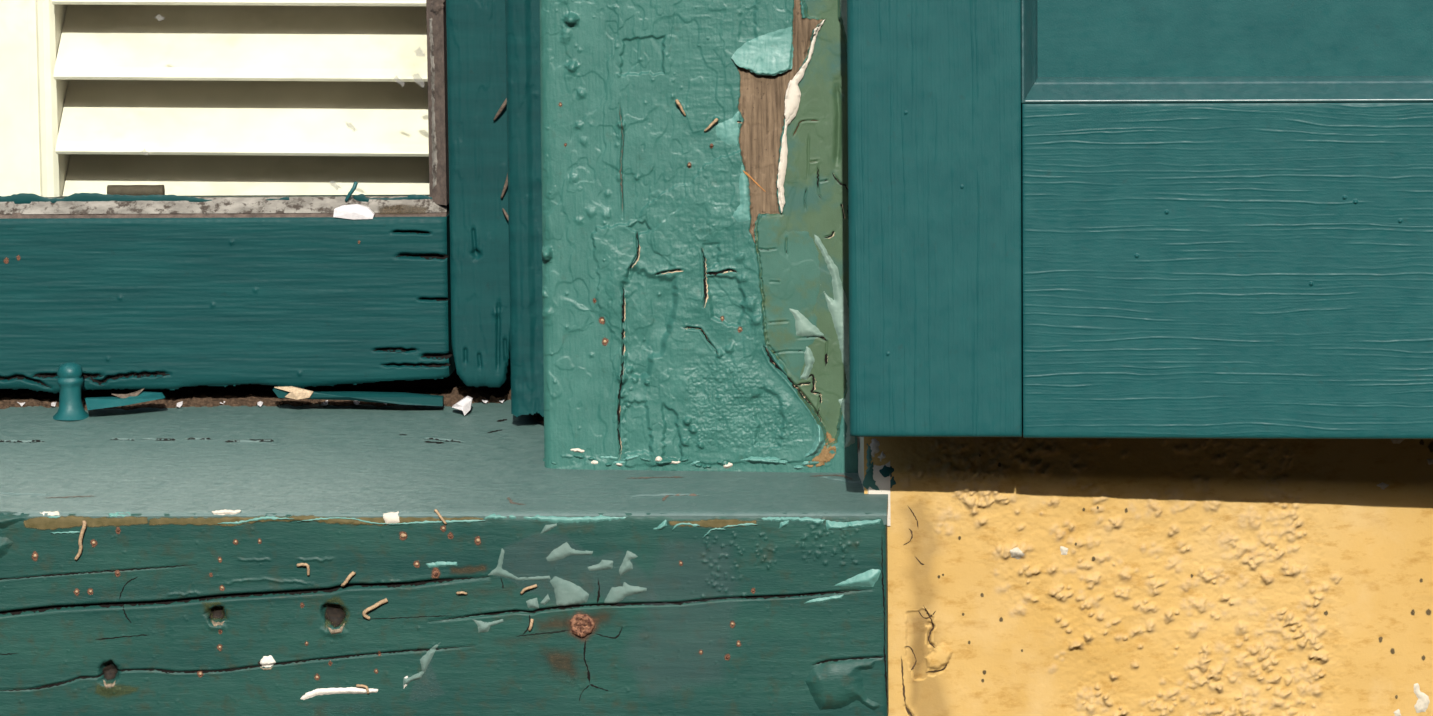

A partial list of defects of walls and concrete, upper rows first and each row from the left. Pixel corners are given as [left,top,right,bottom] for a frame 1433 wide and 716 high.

spalling [333,204,374,219]
peeling [716,0,855,470]
crack [616,115,788,501]
peeling [543,448,733,469]
crack [816,437,859,480]
peeling [24,509,627,534]
peeling [653,517,825,538]
peeling [426,542,647,609]
crack [0,505,947,716]